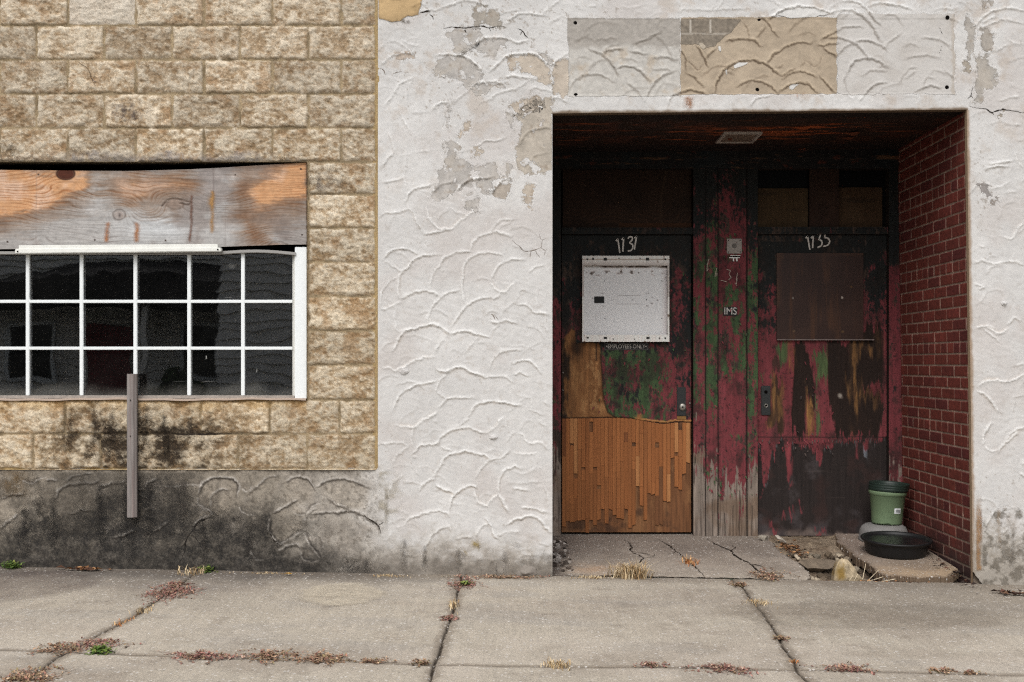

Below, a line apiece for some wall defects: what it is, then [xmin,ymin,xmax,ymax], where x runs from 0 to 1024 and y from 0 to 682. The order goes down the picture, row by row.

spalling [378,0,422,22]
peeling [962,17,999,103]
peeling [431,3,575,212]
water stain [0,409,334,572]
crack [565,541,767,579]